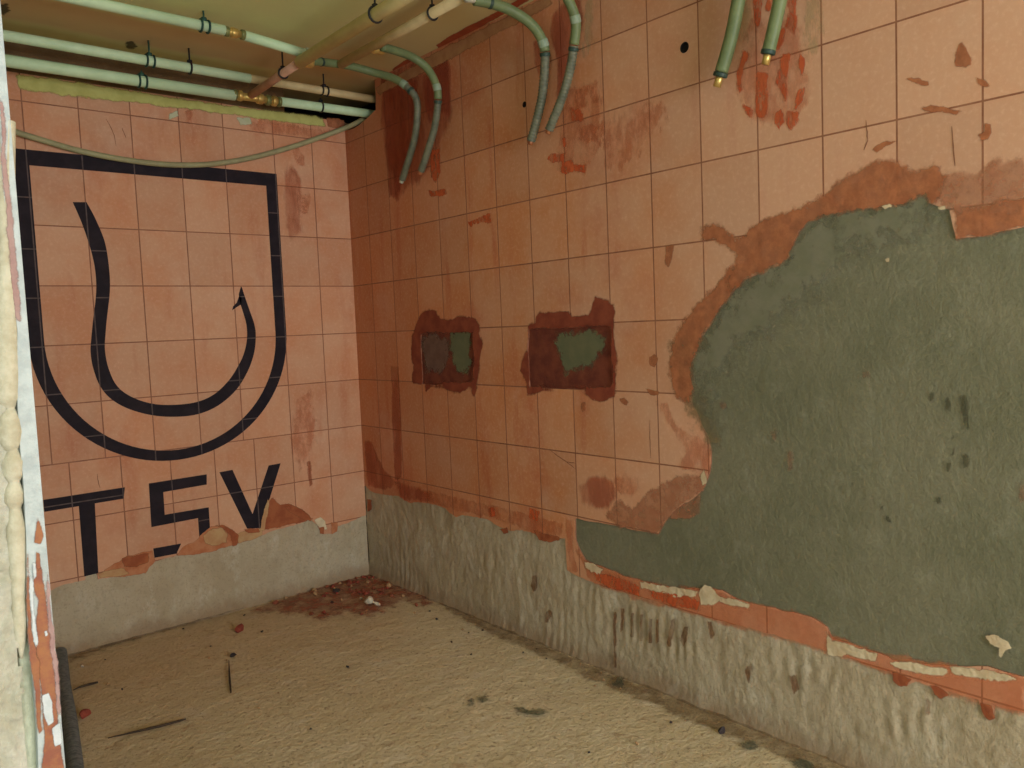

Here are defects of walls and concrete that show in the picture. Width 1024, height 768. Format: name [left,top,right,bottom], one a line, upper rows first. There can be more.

spalling [29,160,1024,768]